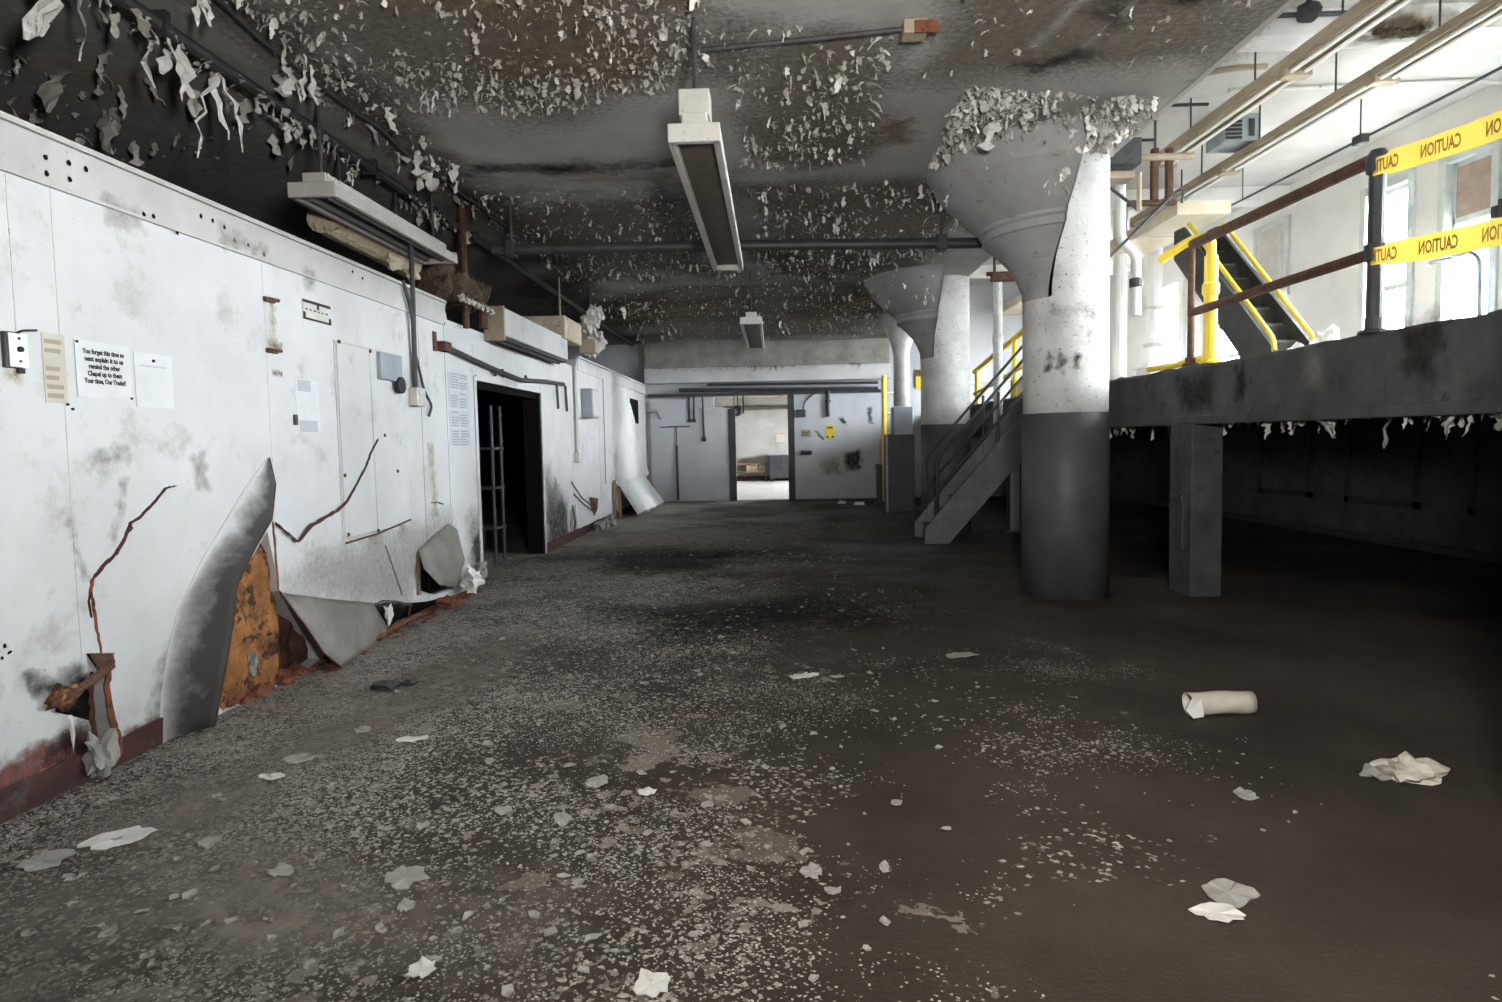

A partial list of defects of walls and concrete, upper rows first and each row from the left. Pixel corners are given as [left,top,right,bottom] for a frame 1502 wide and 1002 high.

spalling [1357,12,1433,42]
crack [275,439,379,542]
crack [87,485,177,653]
hole [277,614,308,670]